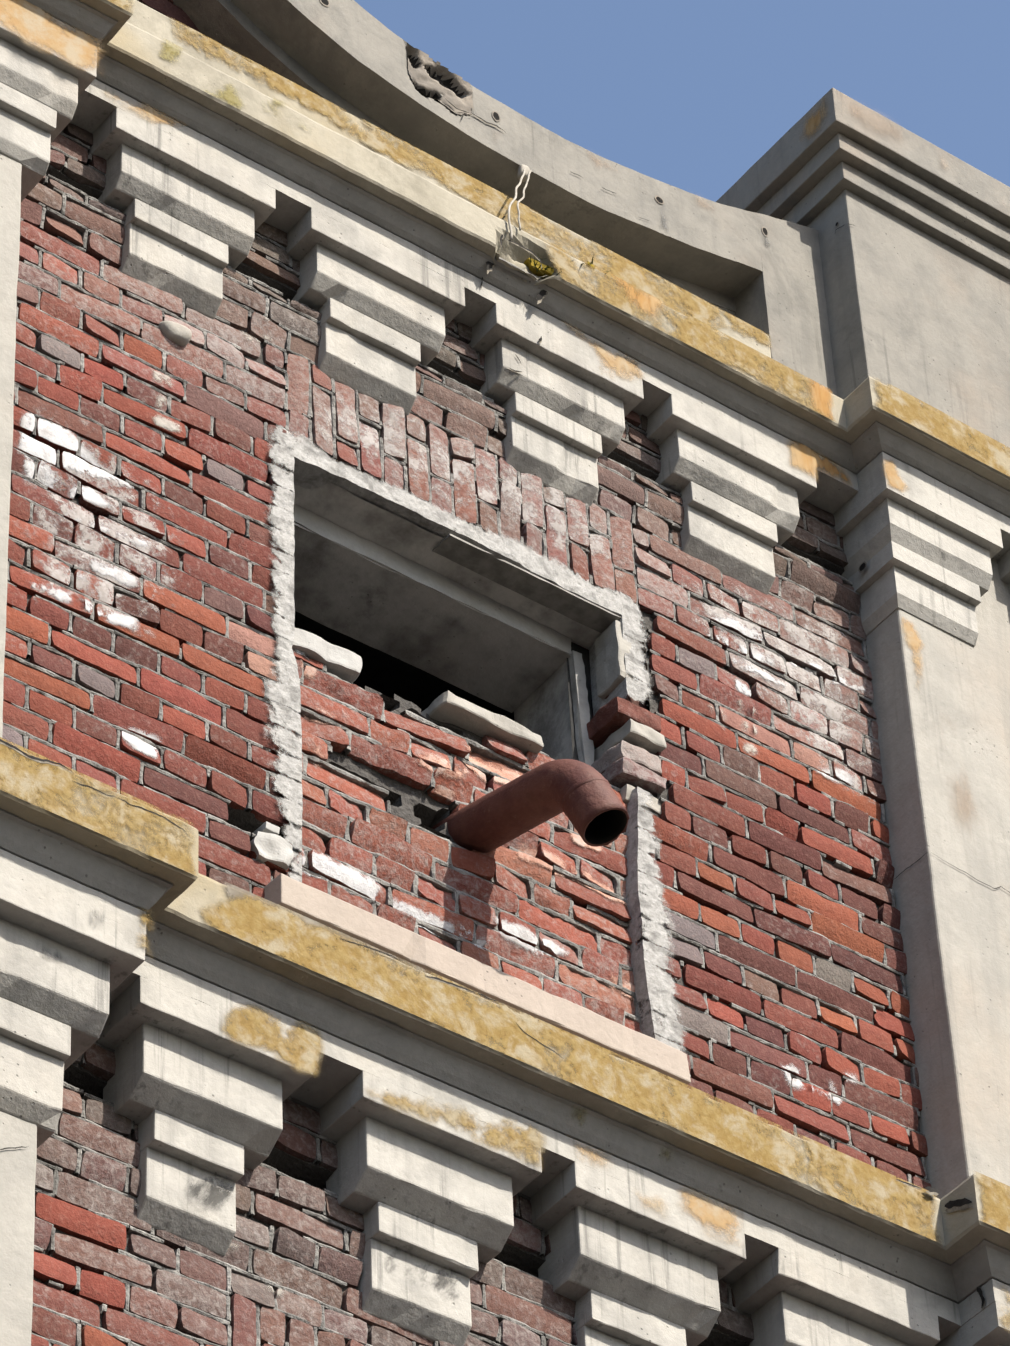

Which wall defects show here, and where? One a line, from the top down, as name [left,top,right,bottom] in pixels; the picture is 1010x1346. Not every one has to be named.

spalling [406,44,473,115]
crack [944,1198,972,1213]